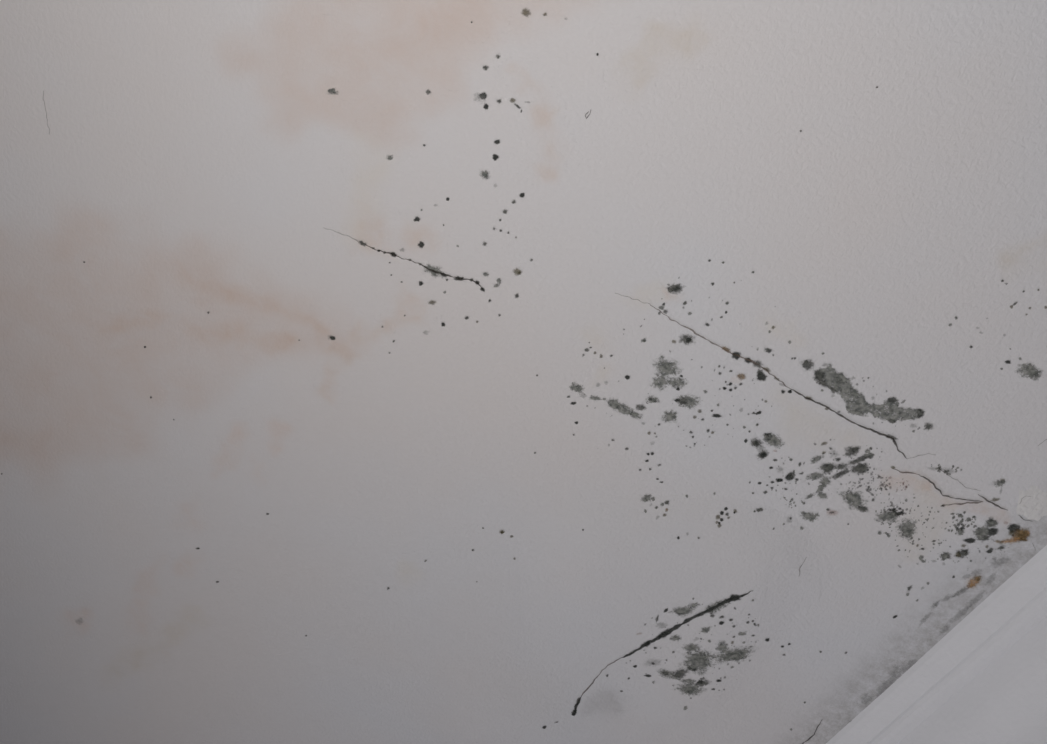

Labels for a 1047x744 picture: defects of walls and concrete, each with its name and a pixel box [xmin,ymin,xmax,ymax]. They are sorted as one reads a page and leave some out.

crack [359,241,485,291]
water stain [658,284,692,315]
water stain [567,356,729,434]
water stain [718,365,792,393]
crack [589,284,1006,525]
water stain [791,353,932,432]
water stain [1001,348,1041,380]
water stain [743,401,1004,563]
rust [996,524,1030,543]
water stain [656,598,699,621]
crack [542,591,751,729]
water stain [628,614,759,710]